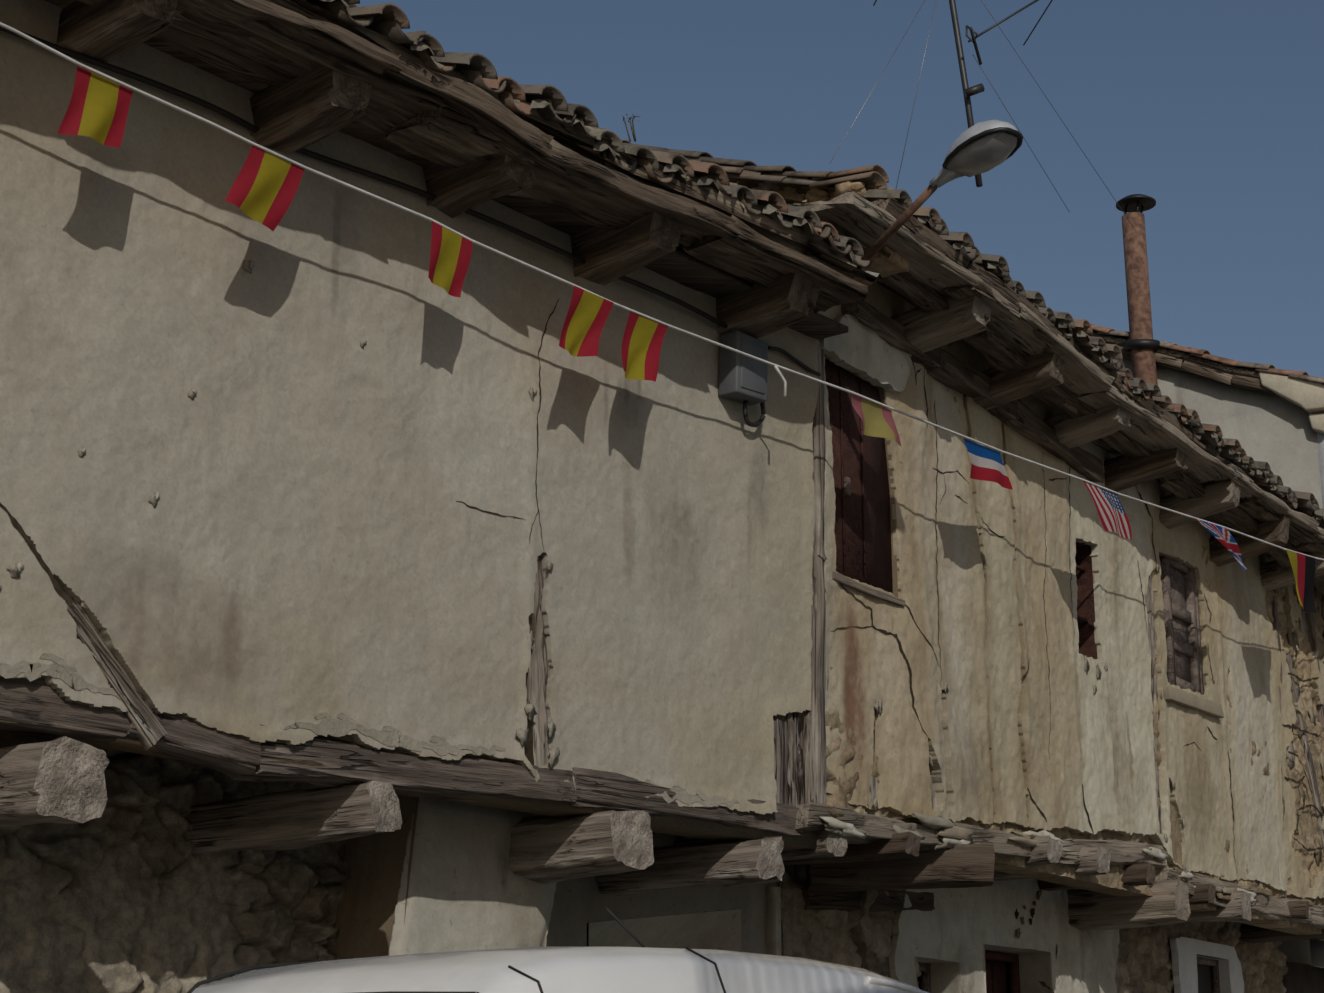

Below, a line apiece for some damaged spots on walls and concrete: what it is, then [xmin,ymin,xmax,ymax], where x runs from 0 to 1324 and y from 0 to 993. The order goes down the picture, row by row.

spalling [0,502,167,751]
crack [456,298,560,548]
crack [834,351,1005,739]
crack [1027,787,1047,822]
crack [1021,463,1075,759]
crack [1082,784,1094,835]
crack [1135,486,1157,627]
spalling [1271,589,1324,867]